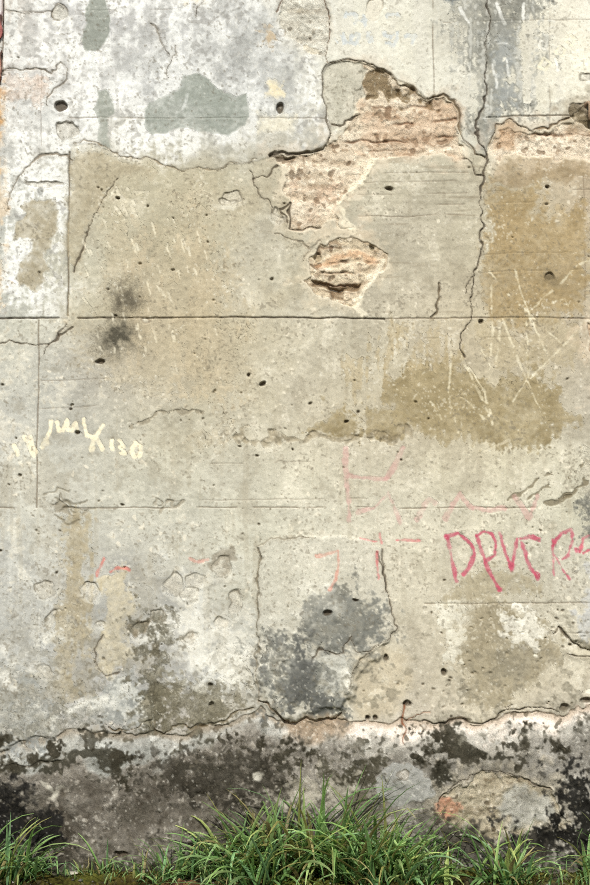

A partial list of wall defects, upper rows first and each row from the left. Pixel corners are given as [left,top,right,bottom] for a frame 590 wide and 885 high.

rust [0,72,53,226]
crack [0,0,588,359]
spalling [277,0,465,307]
water stain [440,0,558,153]
spalling [488,103,590,164]
water stain [301,155,590,454]
water stain [573,445,590,539]
water stain [0,505,391,872]
crack [401,704,556,743]
crack [553,627,590,658]